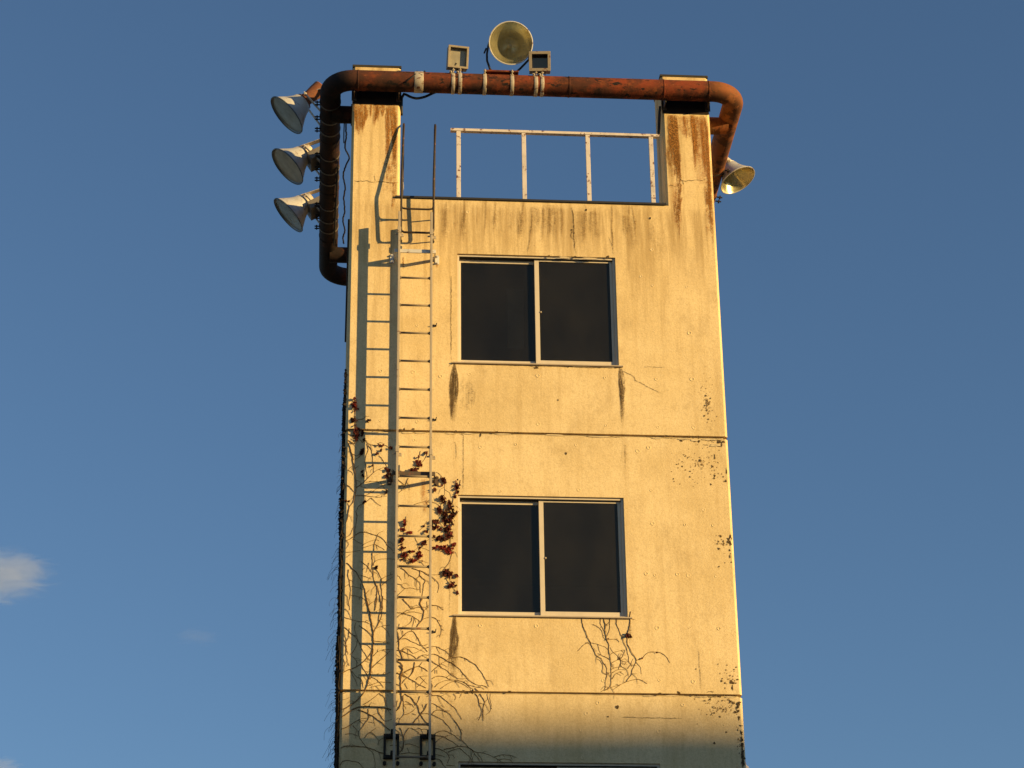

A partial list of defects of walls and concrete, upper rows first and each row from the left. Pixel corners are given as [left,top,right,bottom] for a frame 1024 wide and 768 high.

water stain [450,365,459,413]